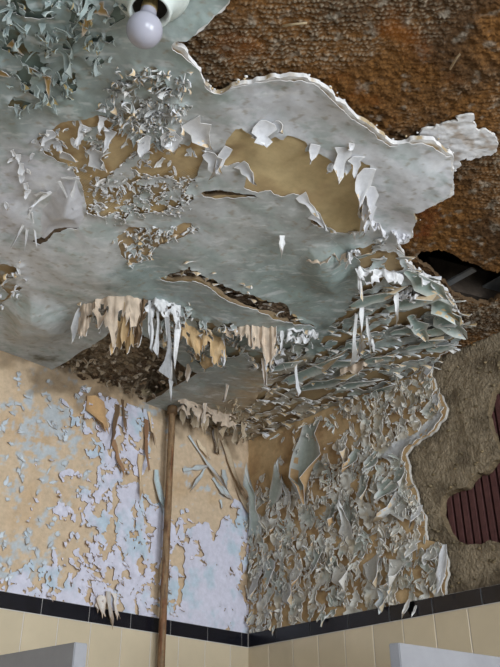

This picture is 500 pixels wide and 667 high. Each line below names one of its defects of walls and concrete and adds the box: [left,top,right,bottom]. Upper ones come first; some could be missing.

peeling [0,0,127,119]
peeling [7,149,35,200]
flaking render [179,0,500,276]
peeling [0,260,27,310]
crack [168,261,303,322]
peeling [37,67,500,634]
peeling [0,385,165,630]